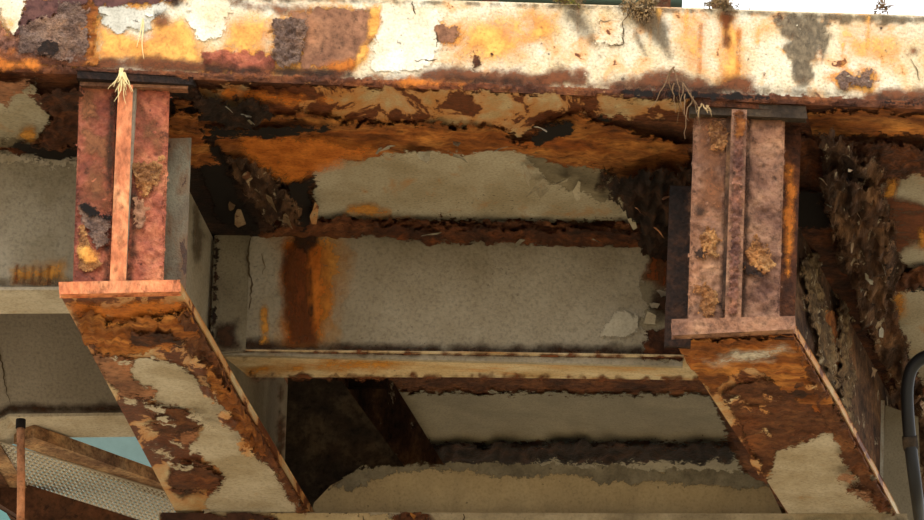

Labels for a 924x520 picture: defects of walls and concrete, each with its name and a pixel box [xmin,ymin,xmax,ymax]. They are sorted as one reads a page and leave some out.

peeling [288,5,381,72]
rust [0,2,924,107]
rust [0,86,117,286]
rust [126,90,172,281]
peeling [375,145,439,164]
peeling [518,152,646,230]
rust [687,117,727,319]
rust [741,119,796,317]
peeling [93,353,257,499]
spalling [160,509,392,520]
rust [71,236,645,508]
peeling [722,252,861,475]